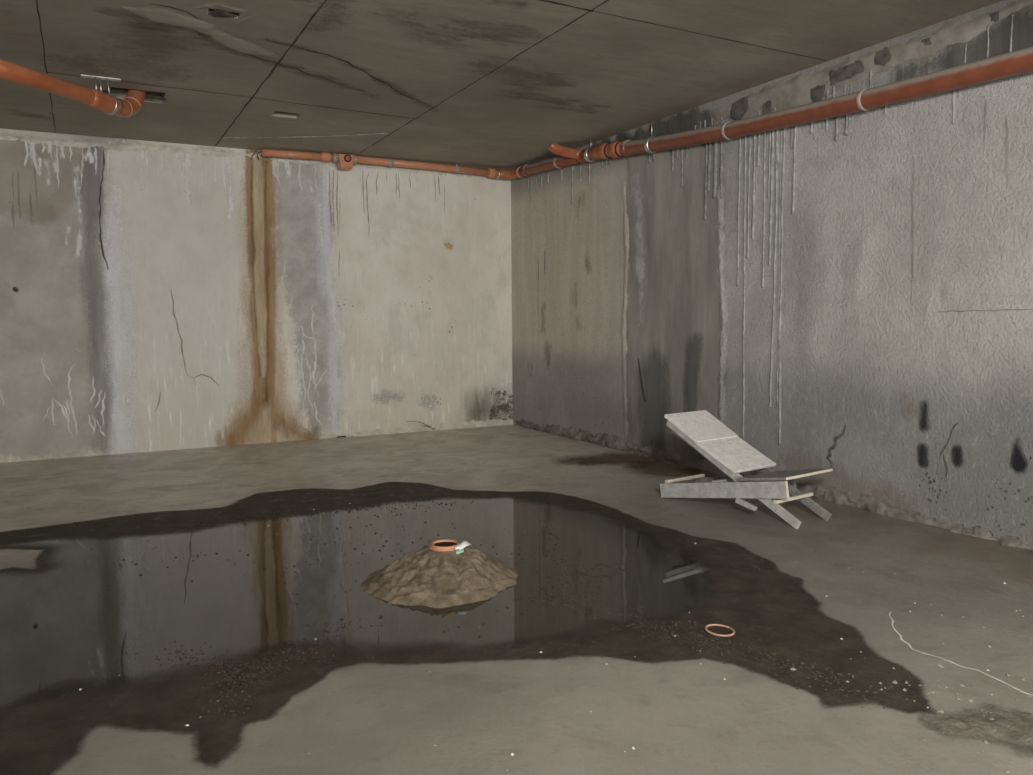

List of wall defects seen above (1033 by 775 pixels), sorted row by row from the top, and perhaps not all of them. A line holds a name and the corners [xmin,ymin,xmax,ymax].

crack [123,4,436,109]
peeling [711,0,1033,122]
crack [99,150,109,270]
damp [0,133,389,458]
crack [171,292,218,385]
rust [225,150,316,446]
crack [826,425,846,467]
damp [918,445,928,467]
damp [952,447,962,466]
damp [1011,442,1027,472]
damp [0,482,933,775]
damp [889,612,1033,696]